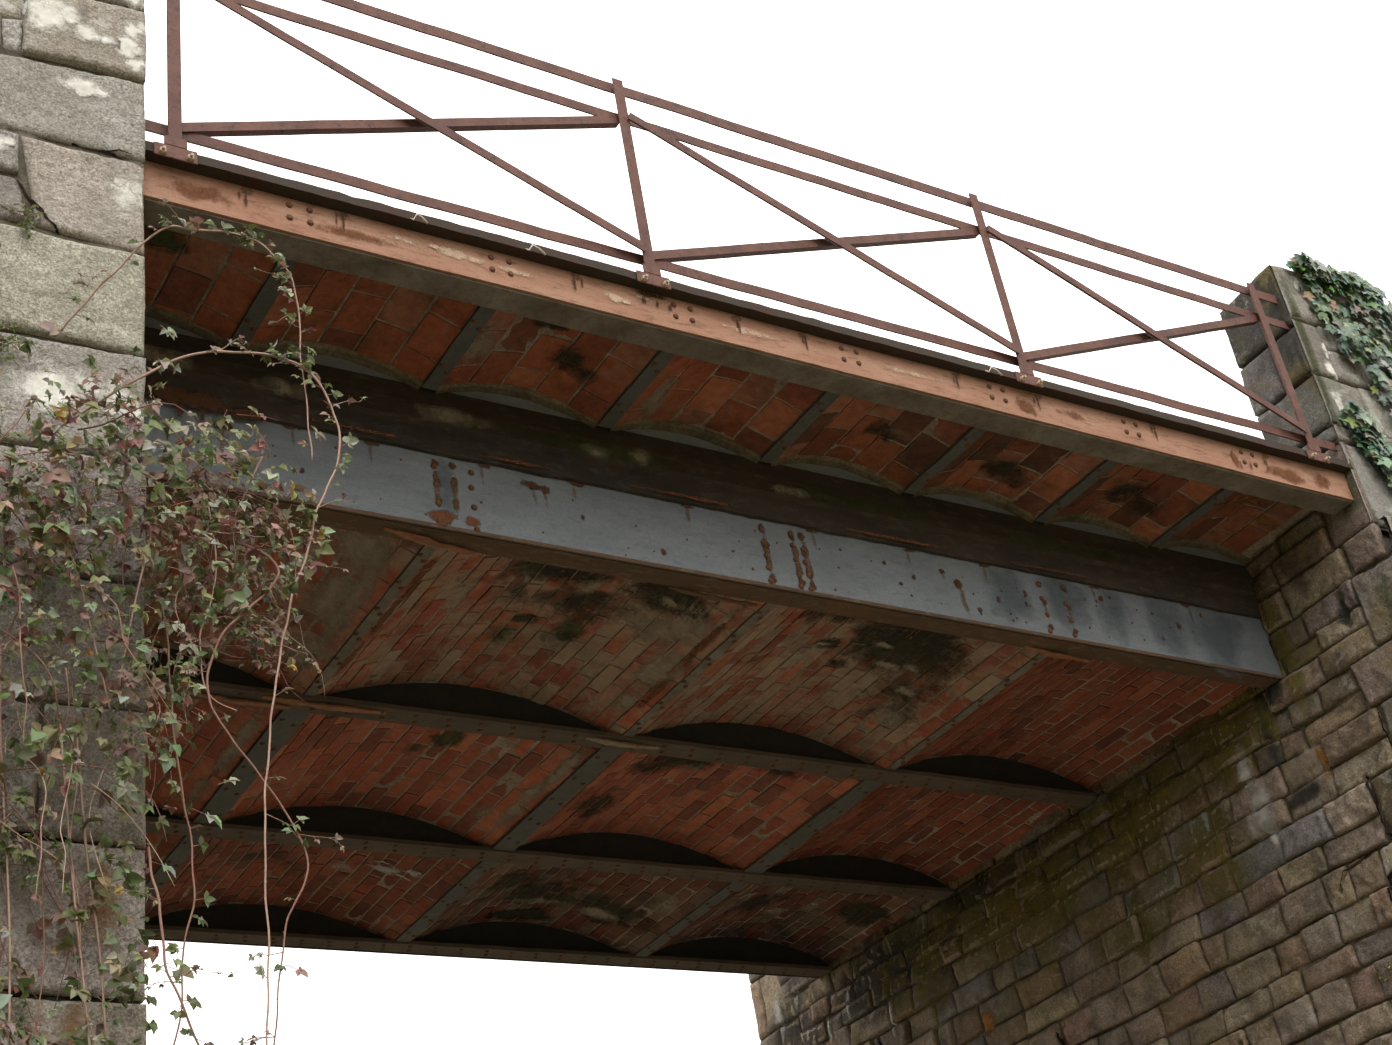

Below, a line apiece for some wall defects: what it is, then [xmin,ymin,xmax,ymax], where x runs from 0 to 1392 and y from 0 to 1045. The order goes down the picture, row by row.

rust [478,456,550,498]
rust [758,524,777,583]
rust [789,529,818,590]
rust [939,569,983,614]
rust [997,562,1111,634]
leakage [505,560,709,711]
leakage [800,610,967,725]
crack [1378,712,1392,745]
crack [1339,776,1392,902]